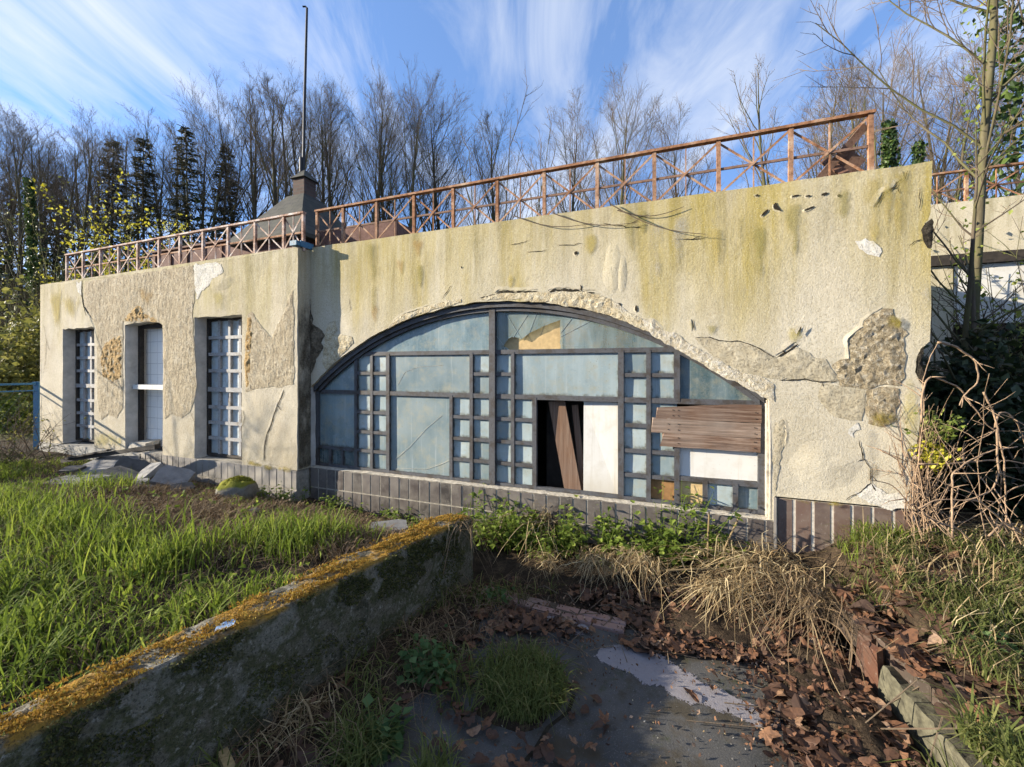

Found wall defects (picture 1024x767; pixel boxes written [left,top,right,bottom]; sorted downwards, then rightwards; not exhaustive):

flaking render [75,262,223,420]
flaking render [244,290,295,394]
flaking render [480,290,924,438]
crack [687,319,836,387]